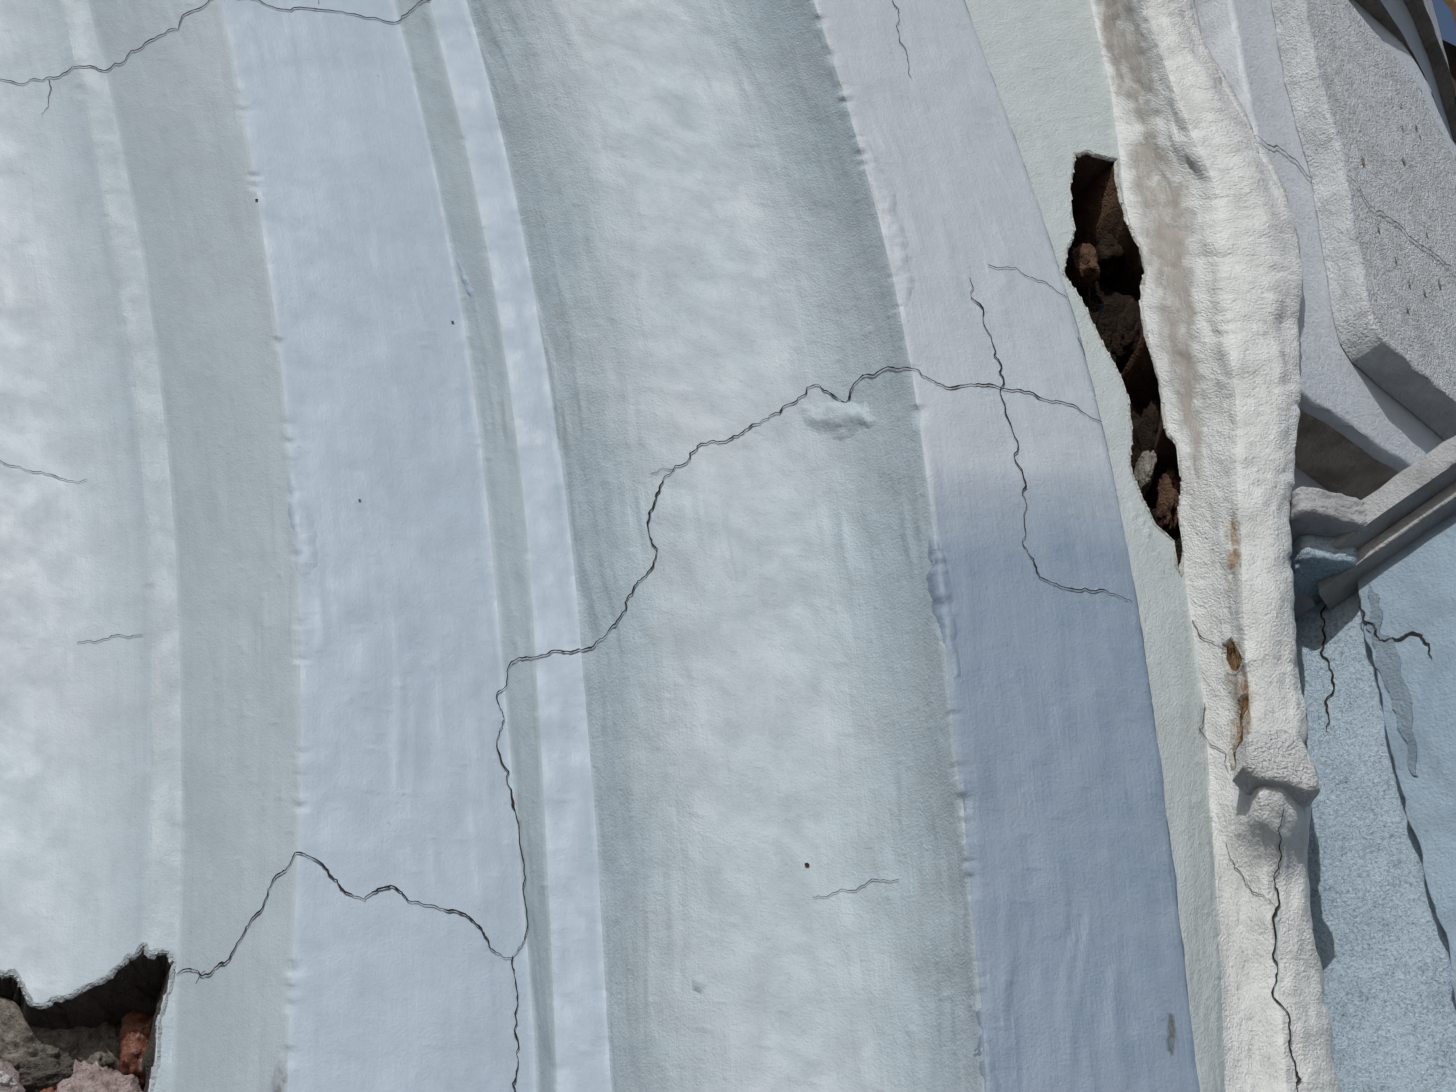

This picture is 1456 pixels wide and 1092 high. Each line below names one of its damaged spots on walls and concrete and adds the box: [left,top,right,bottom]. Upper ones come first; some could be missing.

crack [1,0,209,114]
crack [258,0,430,23]
crack [892,0,911,78]
spalling [1062,149,1185,577]
crack [77,634,143,643]
crack [175,264,1132,1092]
crack [1199,703,1229,772]
crack [1319,597,1432,733]
spalling [0,942,178,1092]
crack [1225,809,1302,1092]